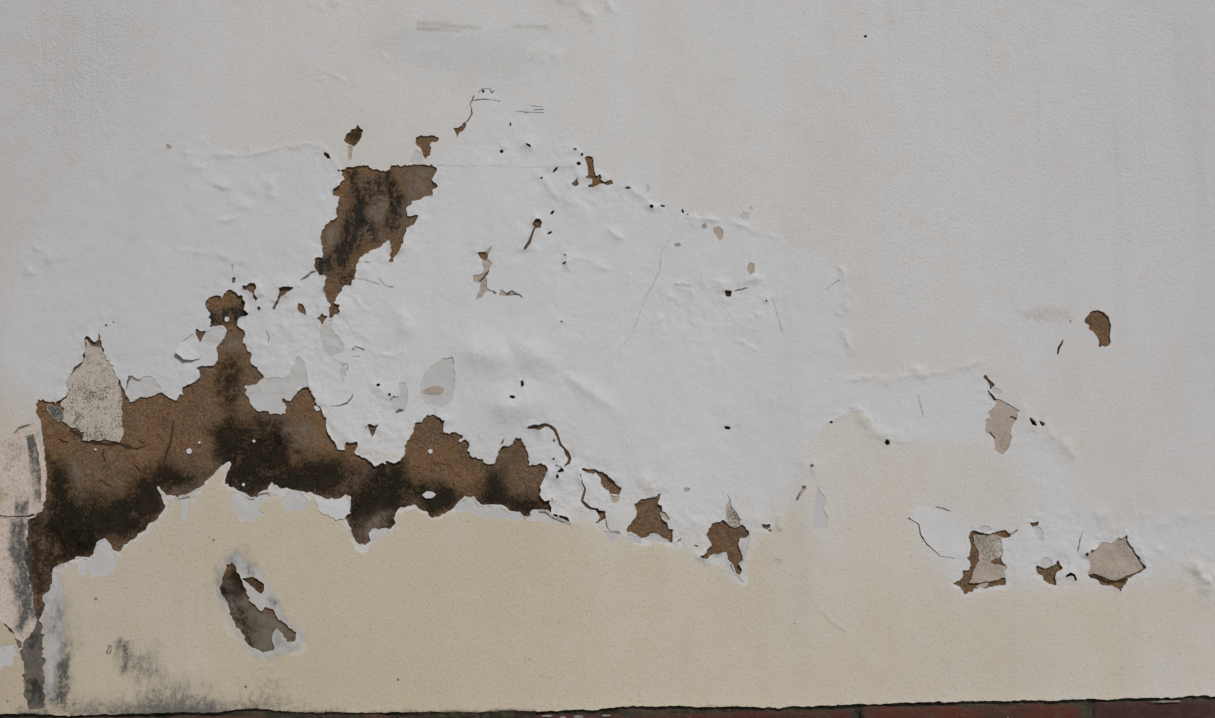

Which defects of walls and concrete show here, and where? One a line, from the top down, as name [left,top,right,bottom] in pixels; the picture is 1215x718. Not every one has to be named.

peeling [1070,310,1111,347]
peeling [0,125,569,710]
peeling [983,375,1019,454]
peeling [580,468,771,583]
peeling [953,522,1043,594]
peeling [1036,557,1062,585]
peeling [1086,535,1145,591]